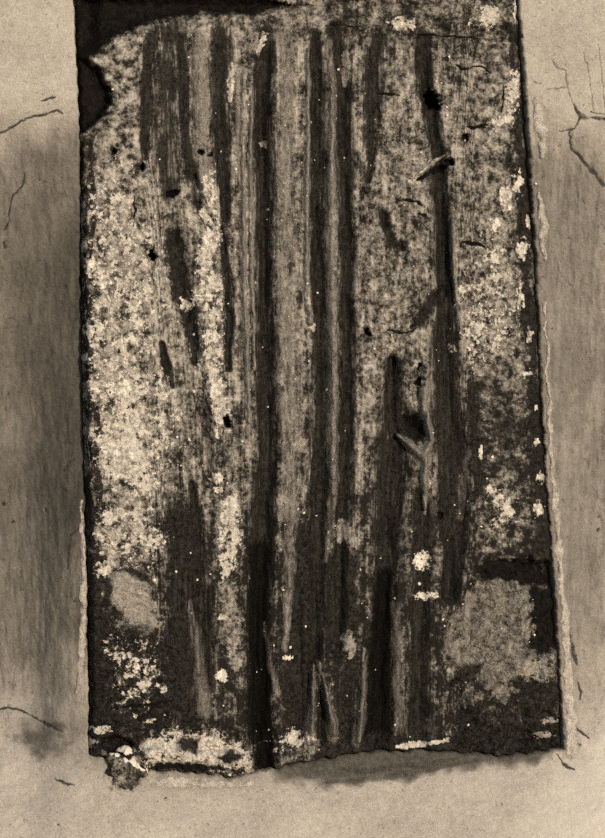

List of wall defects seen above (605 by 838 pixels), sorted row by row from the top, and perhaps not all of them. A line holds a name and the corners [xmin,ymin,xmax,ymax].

crack [0,96,63,133]
damp [139,16,235,372]
spalling [74,0,307,134]
crack [561,104,605,186]
damp [80,141,217,755]
damp [244,0,562,785]